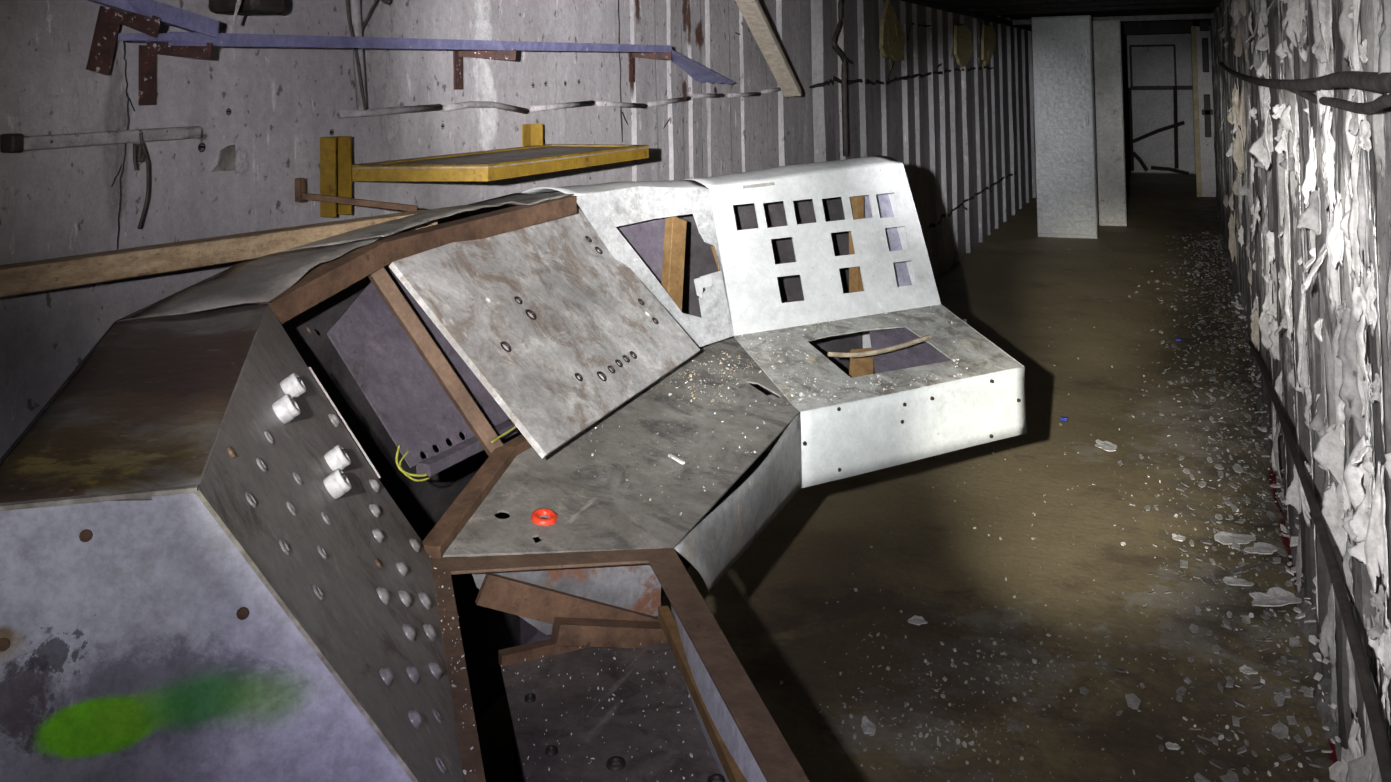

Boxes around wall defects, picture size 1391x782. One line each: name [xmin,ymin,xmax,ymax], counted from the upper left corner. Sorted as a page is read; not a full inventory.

peeling [1217,0,1391,782]